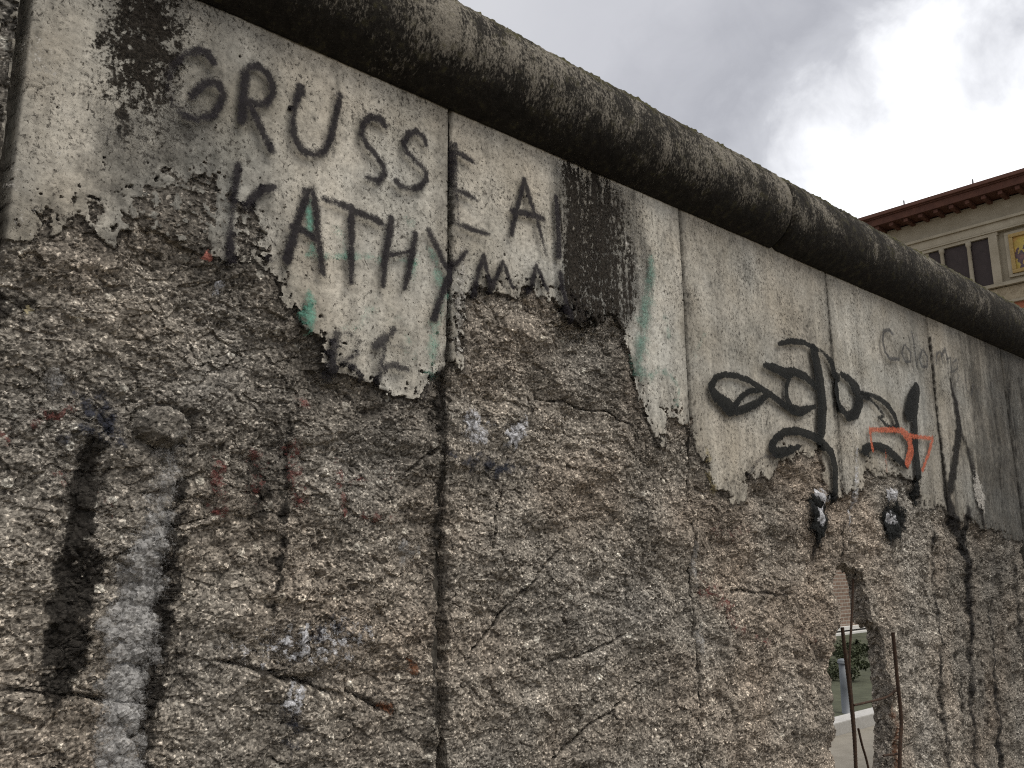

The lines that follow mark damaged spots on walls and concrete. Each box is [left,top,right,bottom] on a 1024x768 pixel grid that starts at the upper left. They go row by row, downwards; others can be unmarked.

damp [79,0,198,142]
damp [447,167,456,261]
damp [556,161,648,341]
damp [429,277,541,546]
spalling [0,156,1024,768]